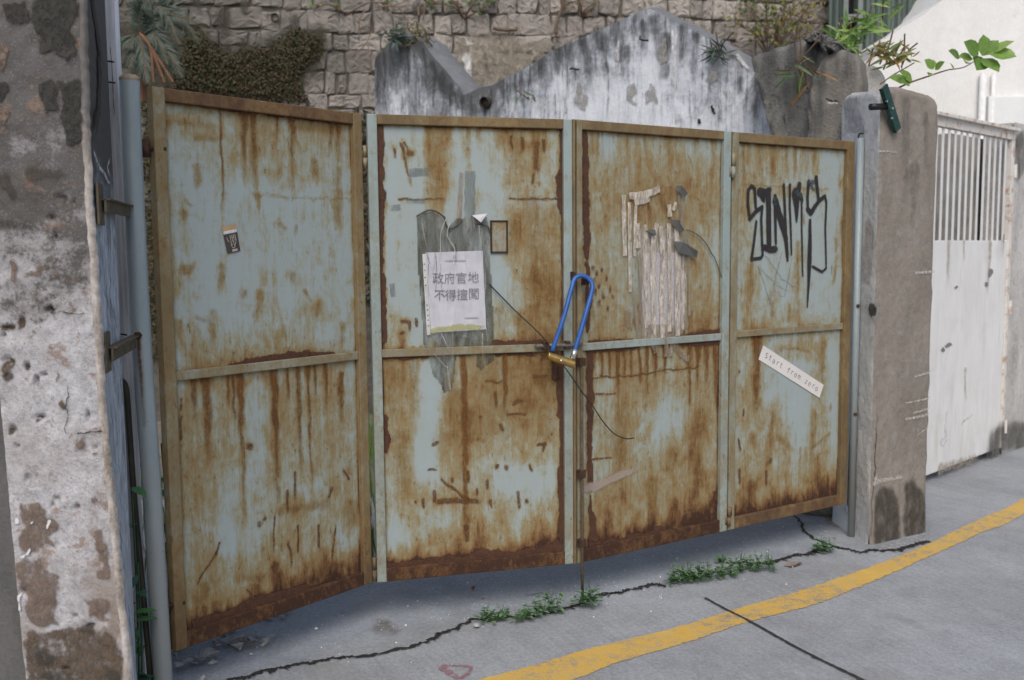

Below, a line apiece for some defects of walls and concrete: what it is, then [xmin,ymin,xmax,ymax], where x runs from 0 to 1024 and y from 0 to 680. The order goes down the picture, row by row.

water stain [554,21,629,65]
water stain [633,17,698,77]
corrosion [377,125,437,360]
corrosion [509,129,563,276]
corrosion [582,130,720,543]
corrosion [180,377,211,440]
corrosion [227,350,344,471]
corrosion [383,415,391,453]
corrosion [386,339,564,568]
water stain [875,481,926,544]
spalling [14,503,122,680]
crack [227,583,666,680]